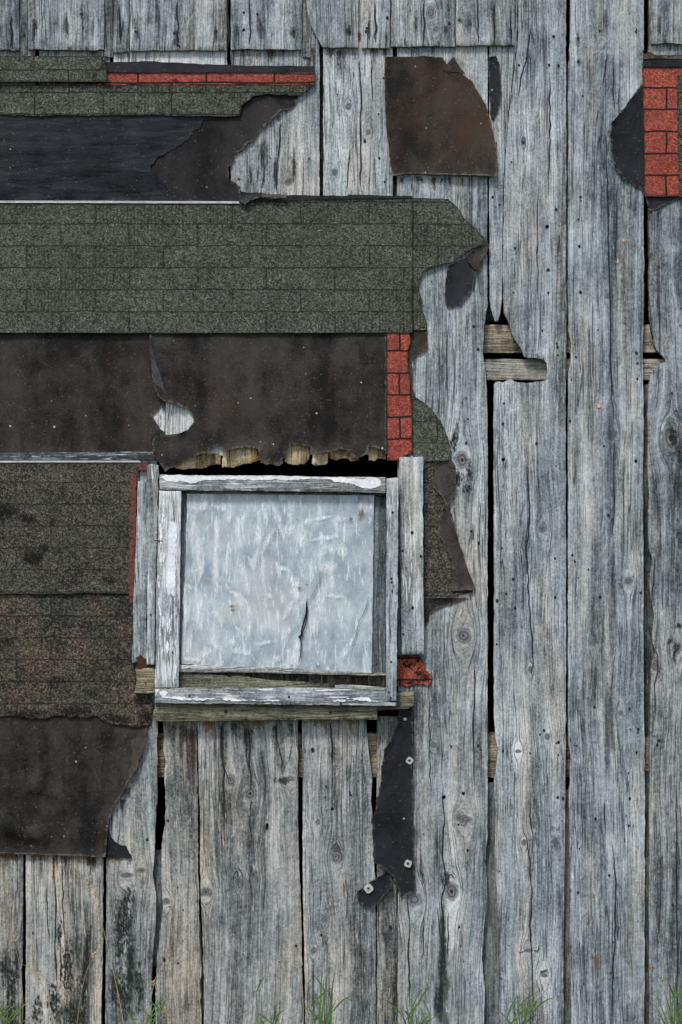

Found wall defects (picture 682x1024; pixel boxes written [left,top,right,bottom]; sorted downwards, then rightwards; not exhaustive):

crack [298,574,320,661]
crack [525,456,534,675]